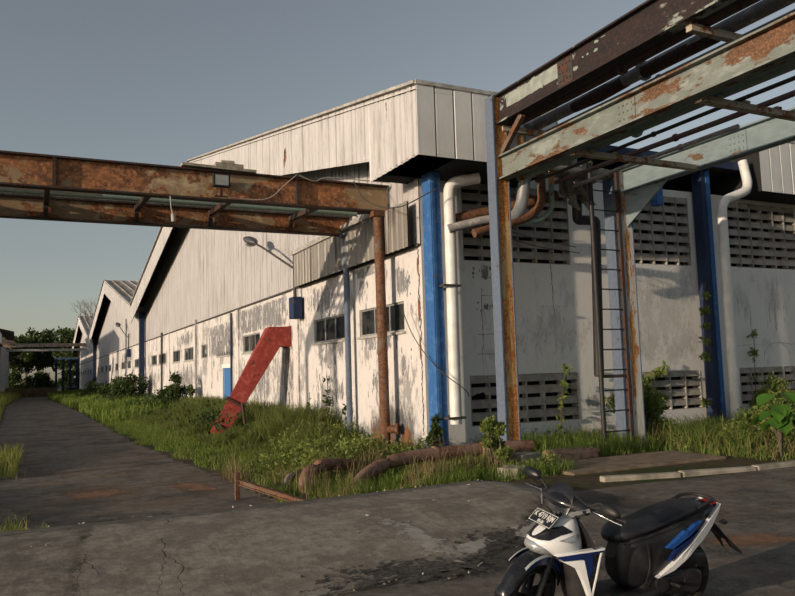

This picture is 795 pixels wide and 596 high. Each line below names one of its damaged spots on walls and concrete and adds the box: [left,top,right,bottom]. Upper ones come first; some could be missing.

peeling [500,64,558,111]
crack [157,519,203,596]